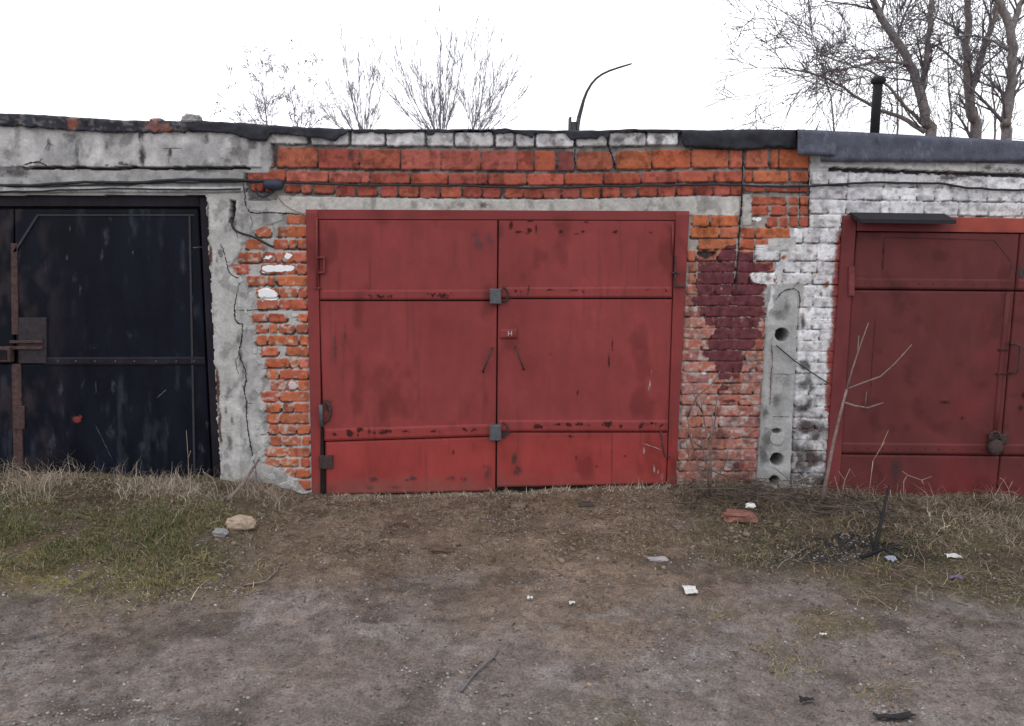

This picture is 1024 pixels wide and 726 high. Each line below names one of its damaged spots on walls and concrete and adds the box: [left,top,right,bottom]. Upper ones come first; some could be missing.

crack [730,157,756,298]
crack [220,175,305,473]
peeling [691,243,786,403]